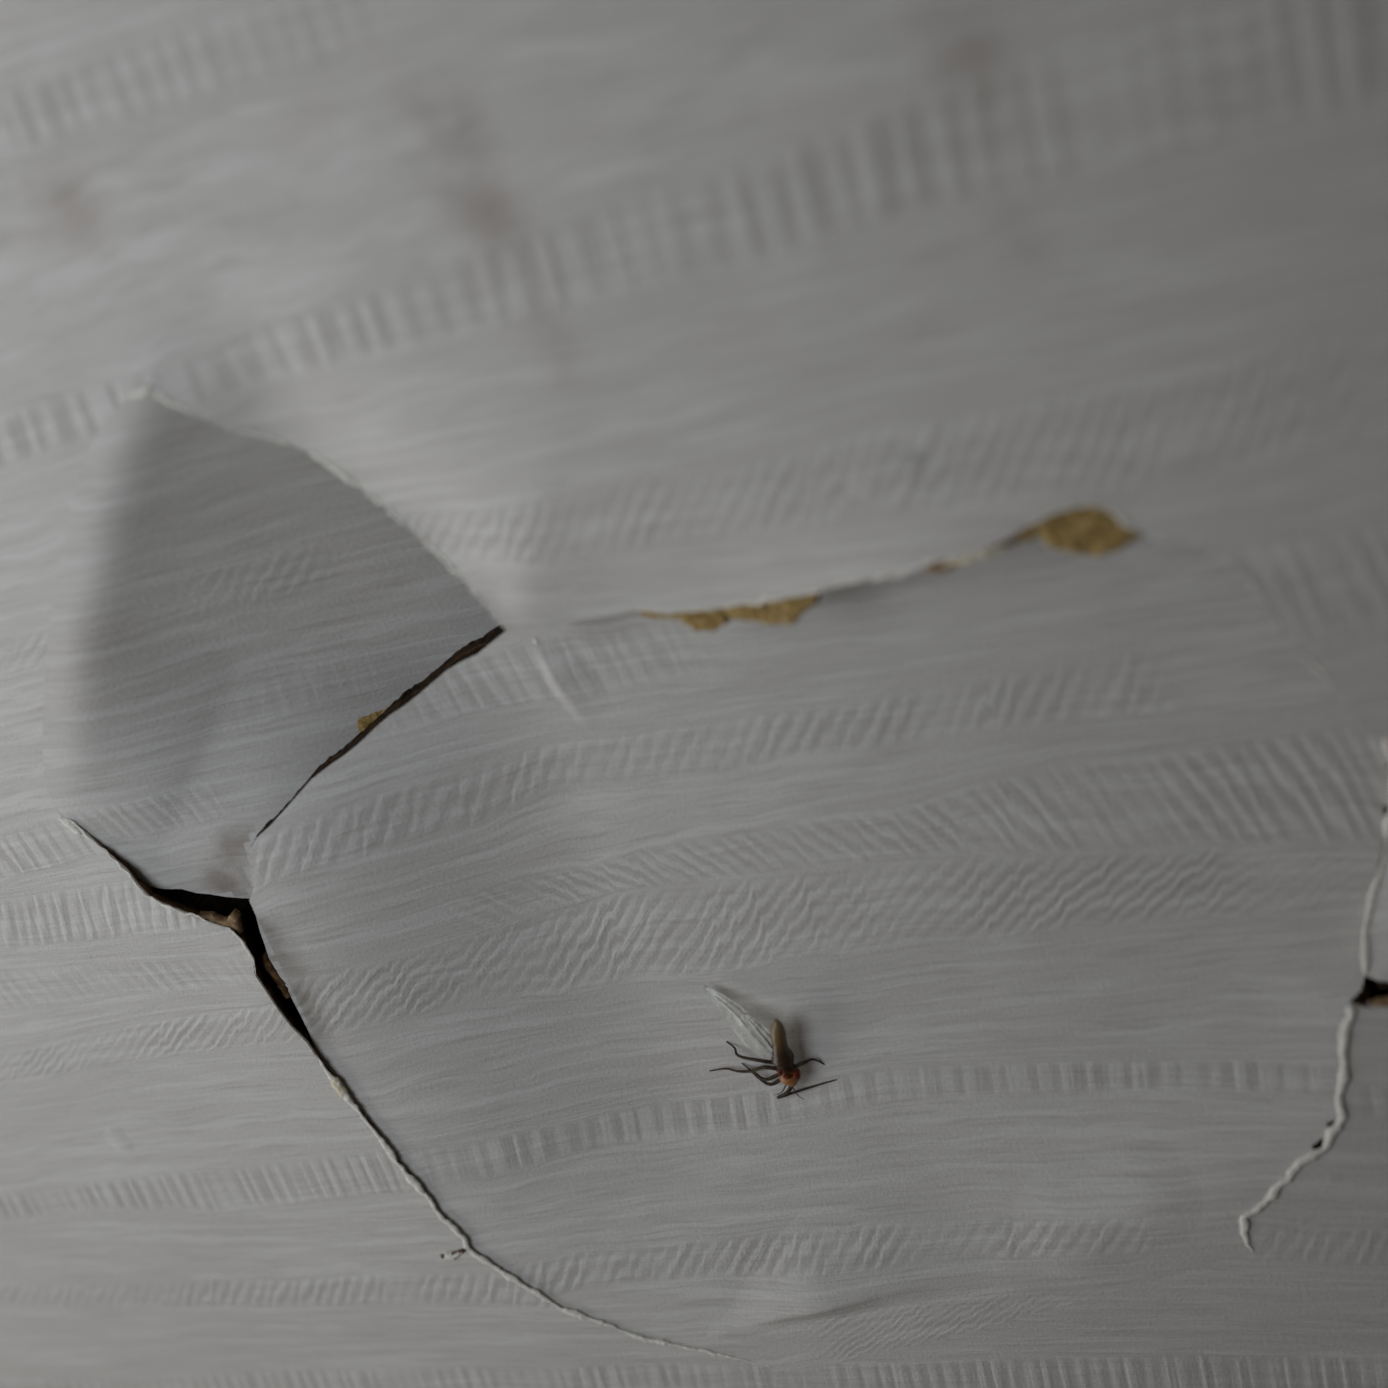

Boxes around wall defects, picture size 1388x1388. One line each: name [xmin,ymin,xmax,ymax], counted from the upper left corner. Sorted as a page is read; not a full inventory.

spalling [926,506,1144,574]
spalling [640,591,823,631]
crack [251,625,506,847]
crack [68,819,306,1028]
spalling [1370,996,1388,1007]
crack [1378,981,1388,989]